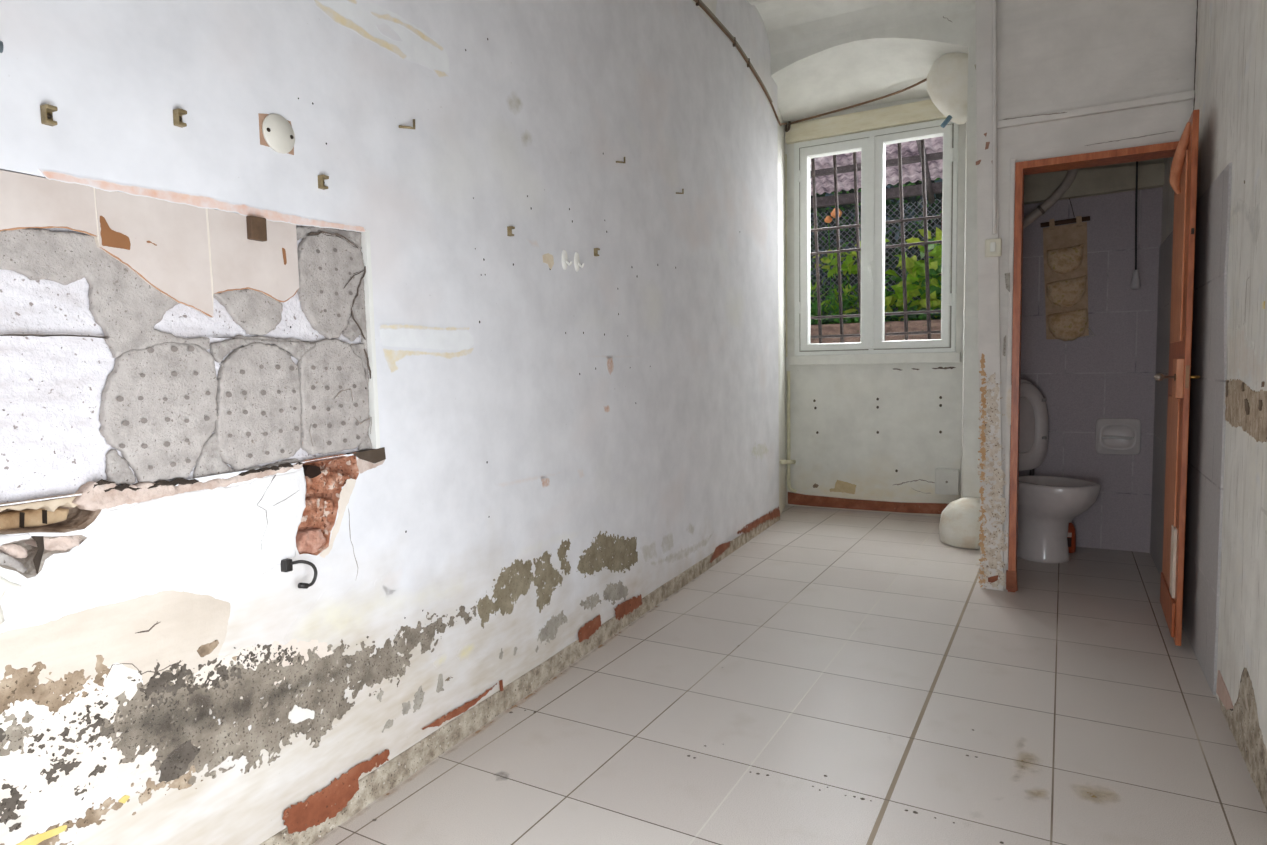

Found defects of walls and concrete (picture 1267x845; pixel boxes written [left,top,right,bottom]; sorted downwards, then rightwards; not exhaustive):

flaking render [976,353,1012,589]
flaking render [1225,379,1267,443]
leakage [512,529,590,561]
leakage [0,689,123,832]
leakage [159,739,200,783]
leakage [131,566,468,726]
peeling [0,531,638,845]
flaking render [1216,668,1267,810]